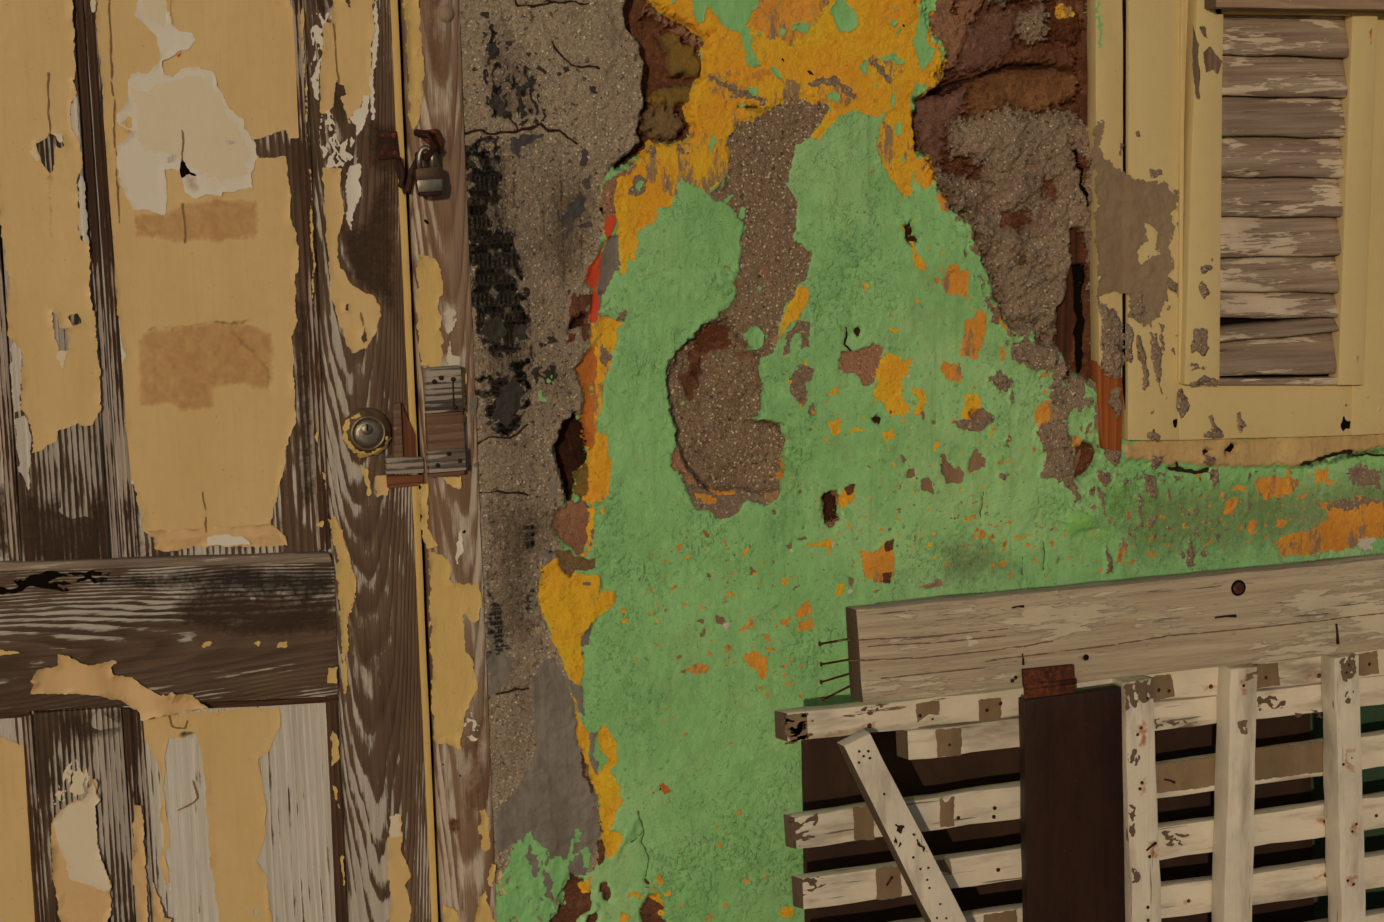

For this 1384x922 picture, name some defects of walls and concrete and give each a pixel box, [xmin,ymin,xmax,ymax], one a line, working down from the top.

crack [514,0,589,8]
crack [551,41,600,70]
crack [464,116,578,145]
crack [1072,149,1089,207]
peeling [95,0,299,552]
peeling [414,254,444,367]
peeling [442,0,1384,922]
crack [1167,462,1209,474]
crack [1300,450,1384,466]
peeling [417,476,513,749]
peeling [0,737,112,922]
peeling [31,654,281,922]